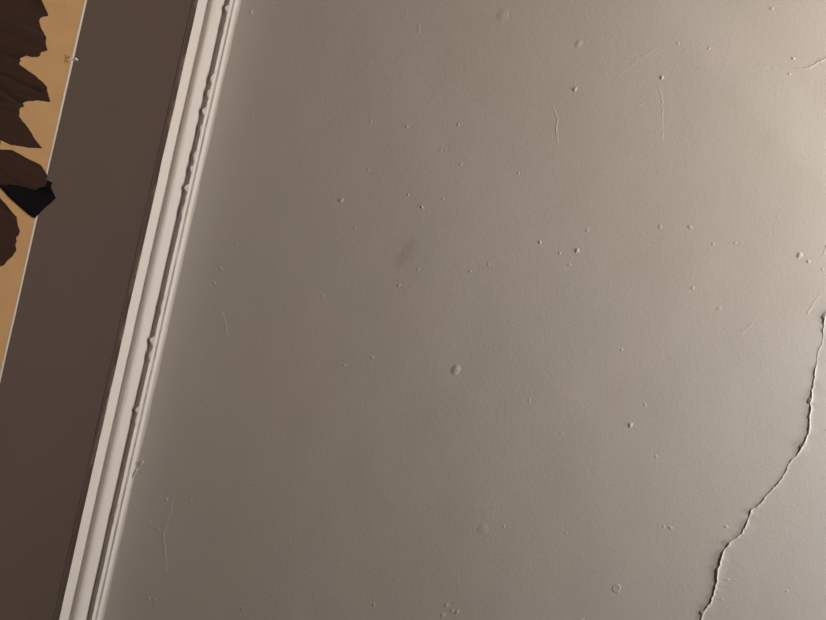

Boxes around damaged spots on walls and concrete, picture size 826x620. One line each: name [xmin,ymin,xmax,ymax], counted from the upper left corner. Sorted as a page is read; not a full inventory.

crack [697,293,826,620]